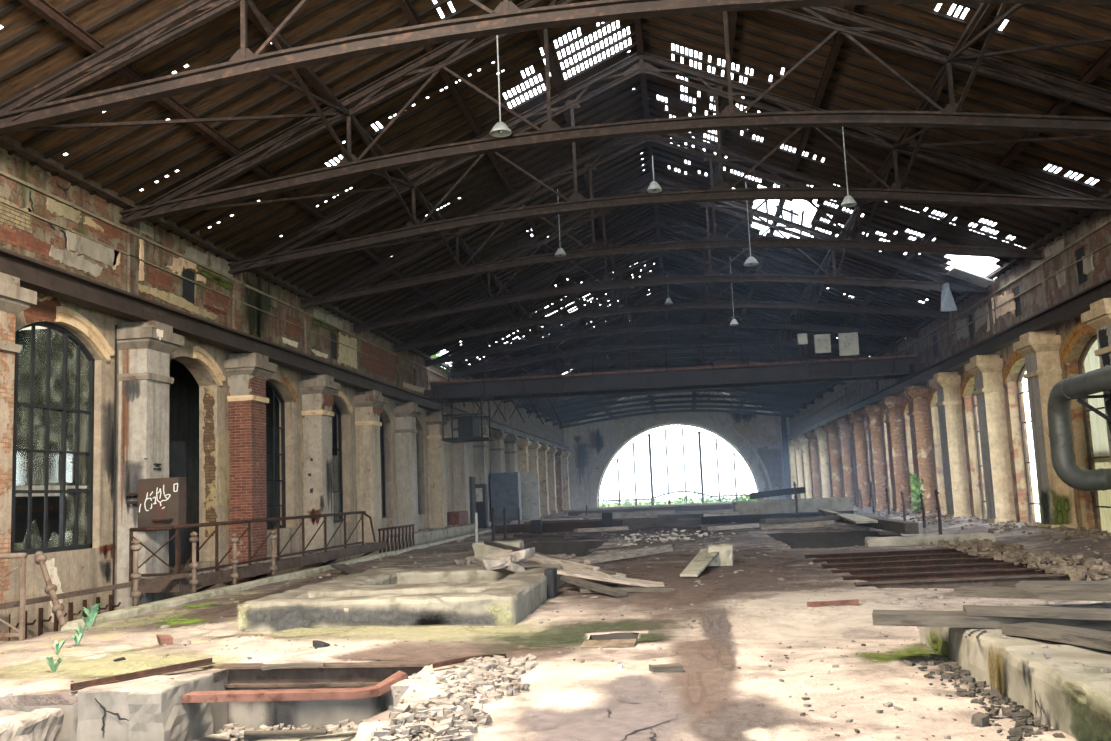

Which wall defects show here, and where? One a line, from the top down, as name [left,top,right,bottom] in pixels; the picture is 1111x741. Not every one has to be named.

flaking render [0,192,123,277]
flaking render [138,222,243,320]
flaking render [282,308,357,369]
leakage [125,380,140,402]
leakage [104,401,142,526]
flaking render [203,387,230,537]
crack [94,698,129,737]